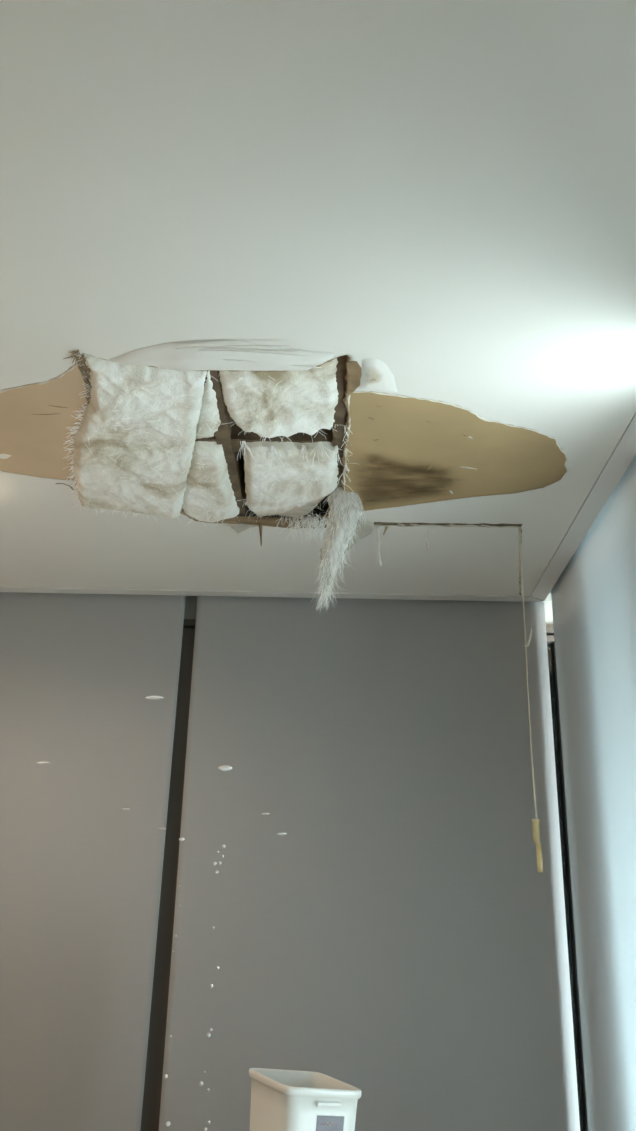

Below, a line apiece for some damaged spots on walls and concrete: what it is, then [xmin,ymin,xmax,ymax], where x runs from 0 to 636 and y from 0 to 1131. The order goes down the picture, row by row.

peeling [0,354,106,502]
leakage [365,459,450,502]
peeling [307,355,568,554]
spalling [180,511,327,529]
crack [374,522,522,596]